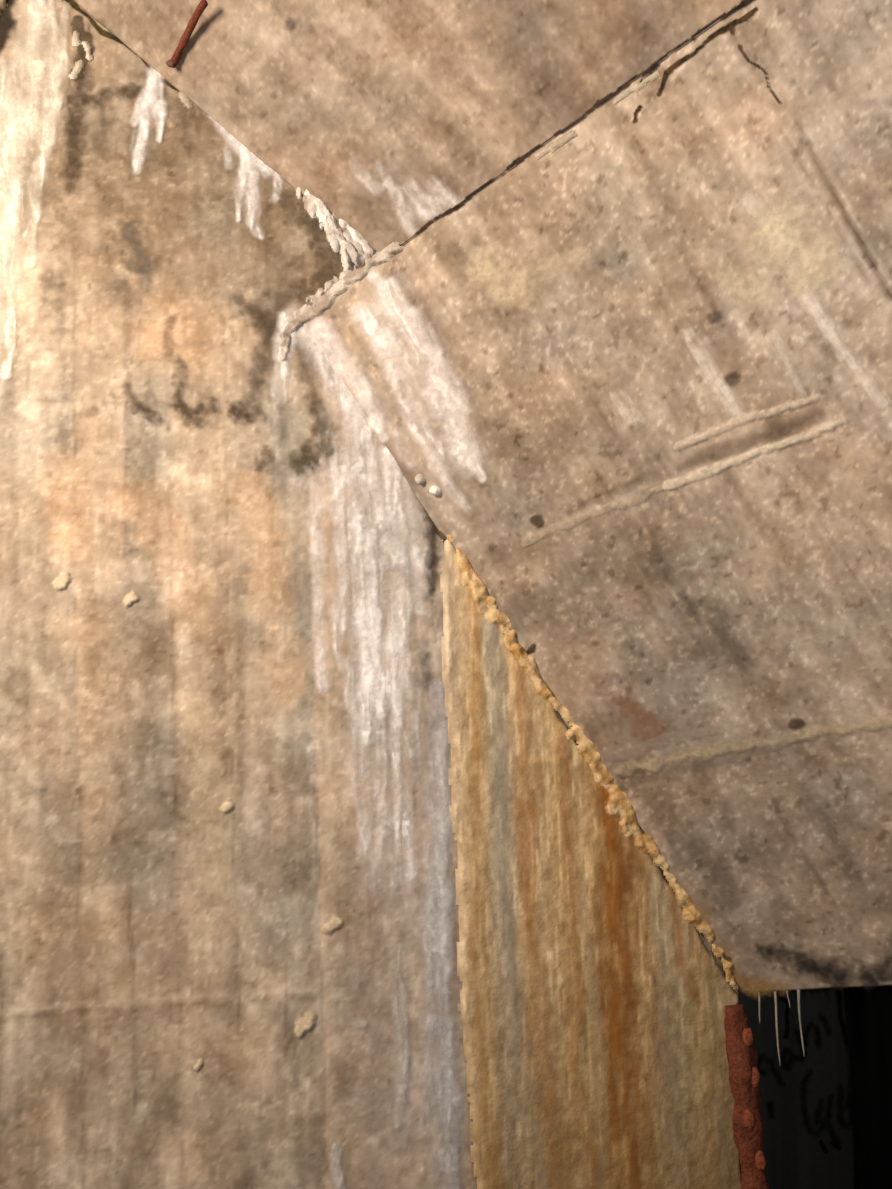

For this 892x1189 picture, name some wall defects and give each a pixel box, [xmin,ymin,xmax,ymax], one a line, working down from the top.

crack [59,0,194,109]
damp [0,0,68,288]
damp [123,70,165,170]
crack [399,0,780,246]
damp [1,307,15,379]
damp [173,398,203,419]
damp [221,126,485,888]
damp [424,722,452,997]
rust [599,786,634,1128]
rust [742,1028,753,1047]
rust [751,1067,760,1088]
rust [755,1150,766,1171]